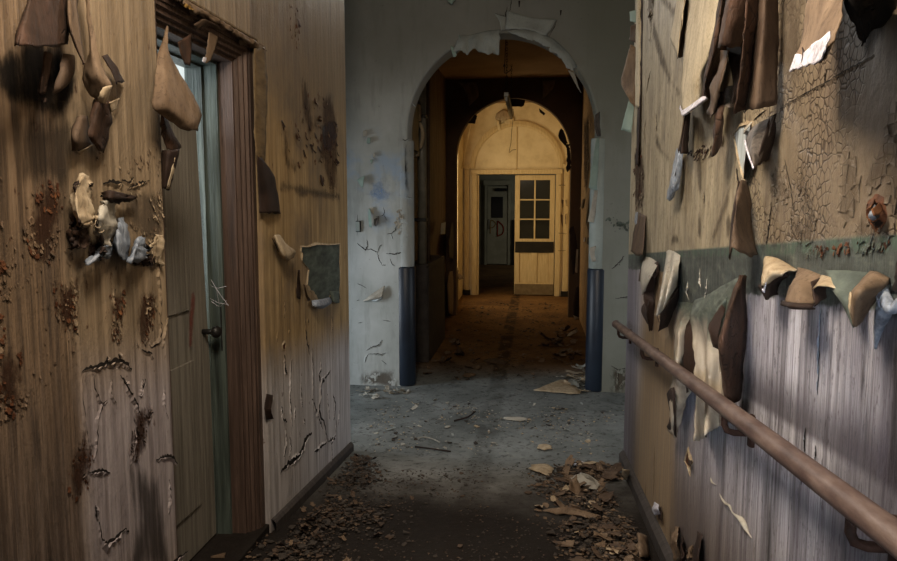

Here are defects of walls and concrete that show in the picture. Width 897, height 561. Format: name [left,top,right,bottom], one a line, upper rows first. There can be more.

peeling [450,11,581,92]
crack [743,54,875,129]
peeling [0,0,281,302]
crack [356,195,412,267]
peeling [580,0,747,403]
crack [766,162,795,243]
crack [81,264,169,480]
spalling [264,394,274,420]
peeling [667,375,721,475]
crack [95,504,129,553]
leakage [134,472,166,561]
crack [156,454,178,515]